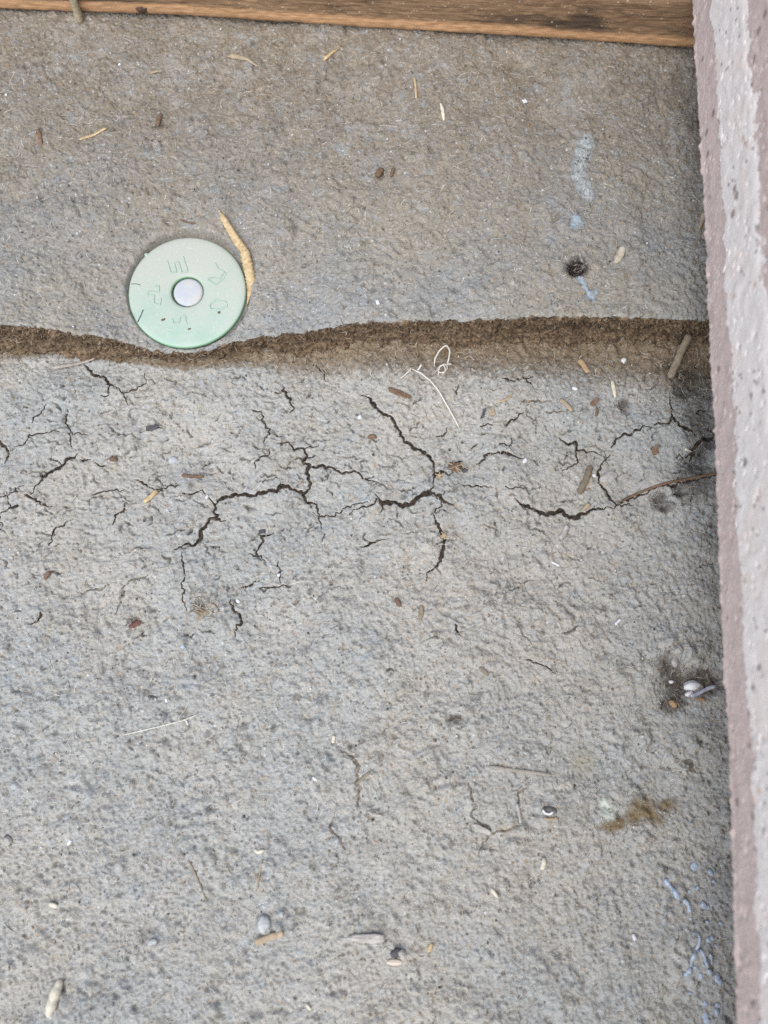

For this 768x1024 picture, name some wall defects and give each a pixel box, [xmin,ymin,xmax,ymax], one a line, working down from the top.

crack [83,363,146,405]
crack [0,376,716,614]
crack [229,533,290,637]